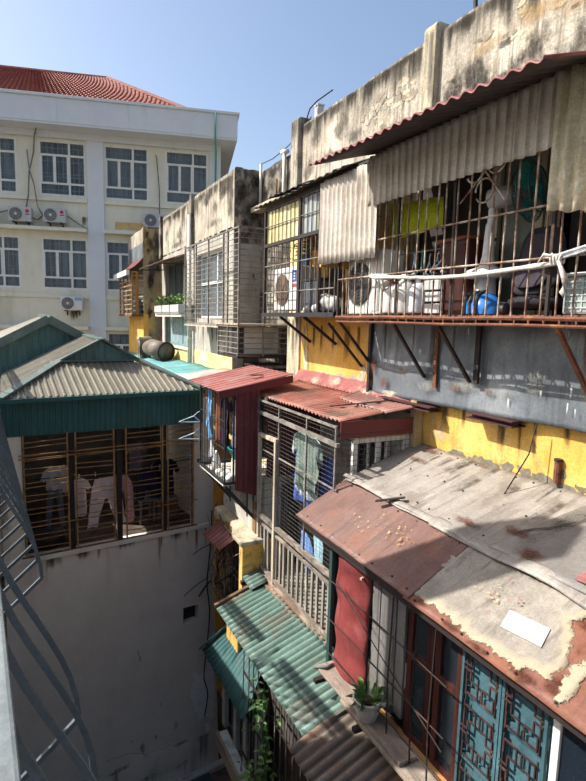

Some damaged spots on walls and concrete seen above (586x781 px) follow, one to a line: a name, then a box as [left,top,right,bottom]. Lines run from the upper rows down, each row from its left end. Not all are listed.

leakage [303,32,433,141]
leakage [447,11,474,49]
leakage [443,59,489,100]
leakage [486,0,510,22]
leakage [499,35,542,76]
leakage [163,167,282,237]
peeling [414,546,586,706]
peeling [190,662,215,734]